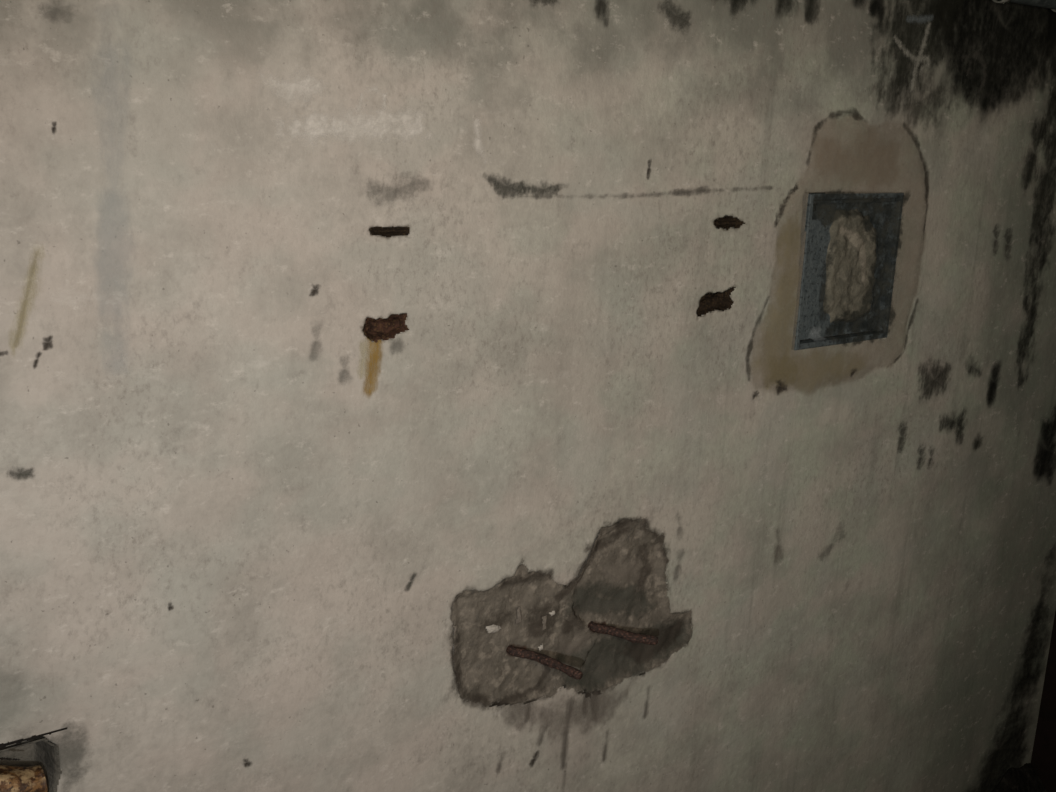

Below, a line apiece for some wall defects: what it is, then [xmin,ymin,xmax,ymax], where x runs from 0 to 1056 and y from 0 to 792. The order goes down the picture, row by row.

water stain [855,0,1056,385]
corrosion [361,331,381,395]
water stain [921,364,951,395]
water stain [1035,413,1056,480]
spalling [450,519,693,706]
spalling [0,737,62,792]